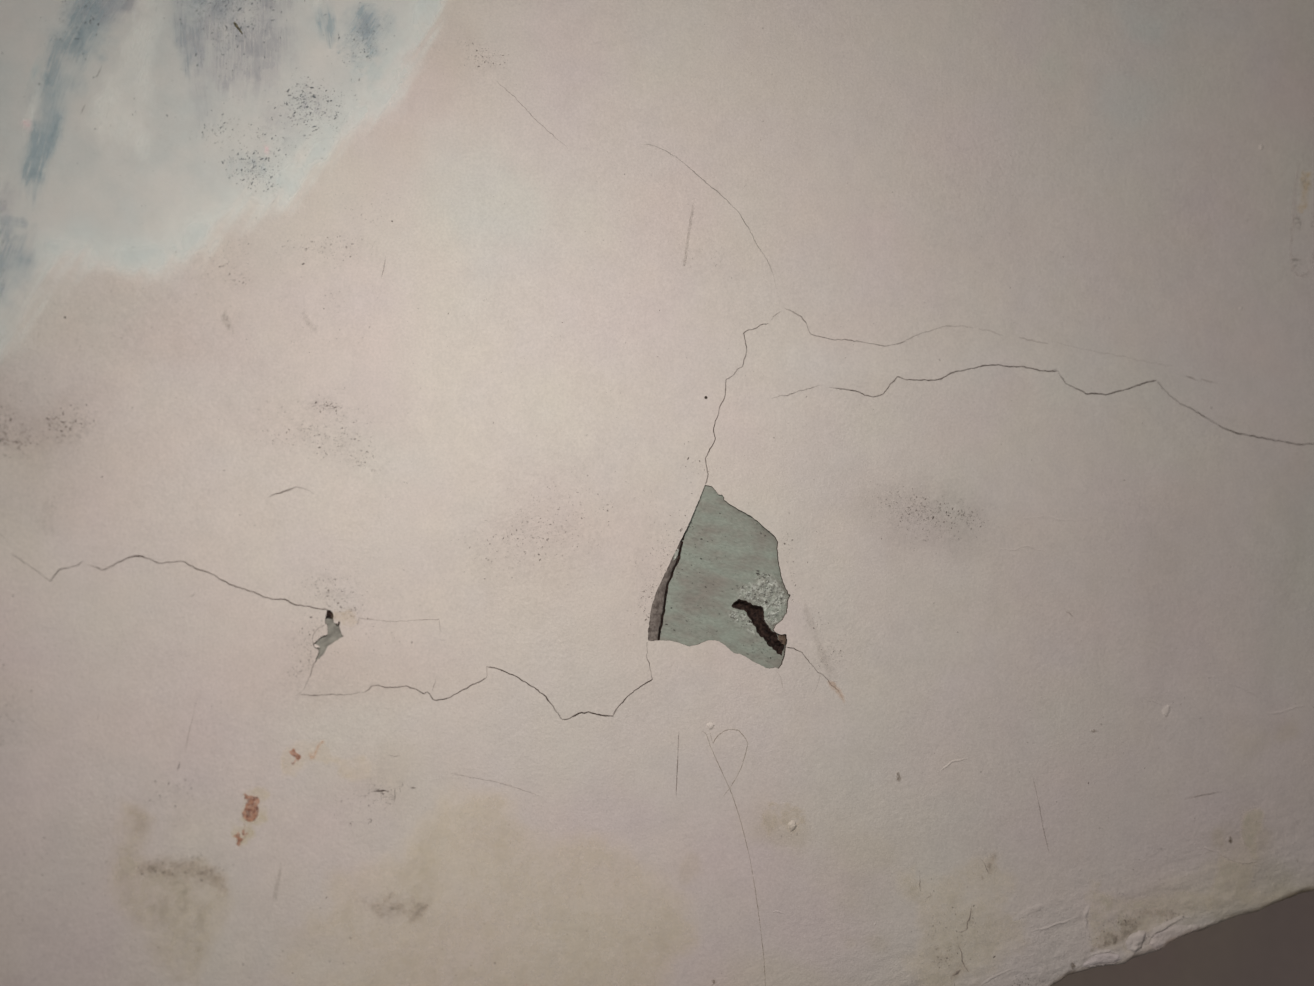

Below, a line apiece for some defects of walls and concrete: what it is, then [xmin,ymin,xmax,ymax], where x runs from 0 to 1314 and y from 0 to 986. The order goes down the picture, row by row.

crack [705,323,768,482]
crack [837,364,1156,397]
crack [1189,377,1314,445]
crack [51,555,329,611]
spalling [642,457,796,669]
spalling [288,569,382,677]
crack [378,659,652,720]